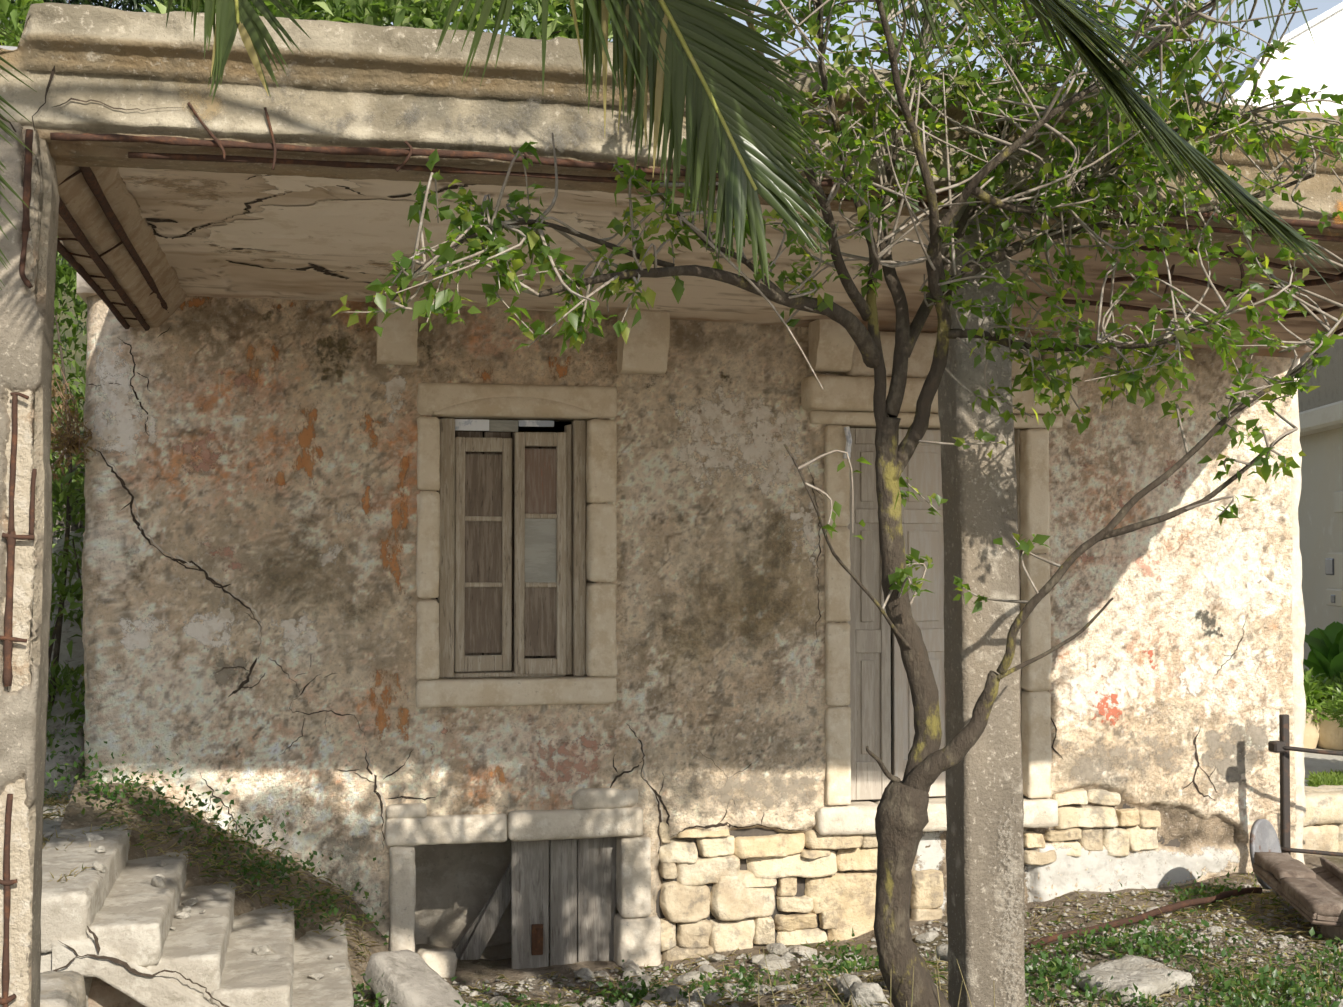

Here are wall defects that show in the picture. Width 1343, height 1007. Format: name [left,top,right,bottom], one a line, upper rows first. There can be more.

crack [0,66,188,132]
crack [146,175,410,287]
peeling [19,102,686,290]
spalling [795,178,971,209]
leakage [741,514,789,647]
crack [87,444,437,848]
peeling [1067,654,1145,725]
peeling [1177,651,1221,699]
crack [610,723,813,865]
crack [1183,726,1217,800]
flaking render [986,733,1183,1007]
crack [53,926,229,1007]